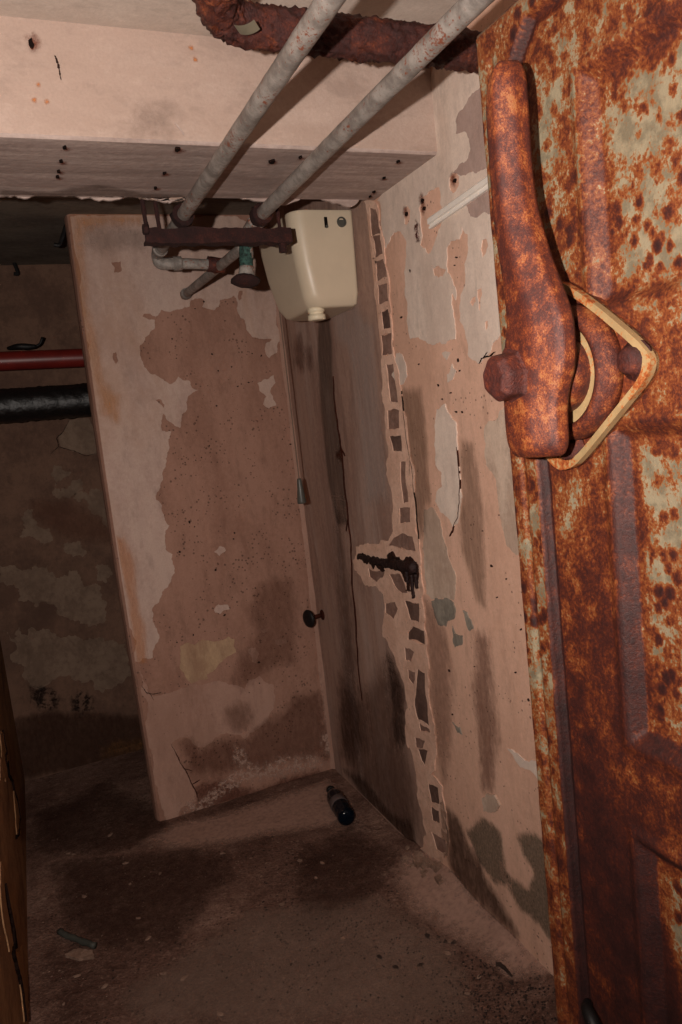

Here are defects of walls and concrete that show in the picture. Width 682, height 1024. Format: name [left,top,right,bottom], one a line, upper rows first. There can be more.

peeling [0,196,280,693]
peeling [320,67,501,858]
peeling [484,408,519,555]
crack [171,744,199,801]
water stain [183,725,330,814]
water stain [351,775,414,842]
peeling [506,748,537,777]
water stain [447,814,551,939]